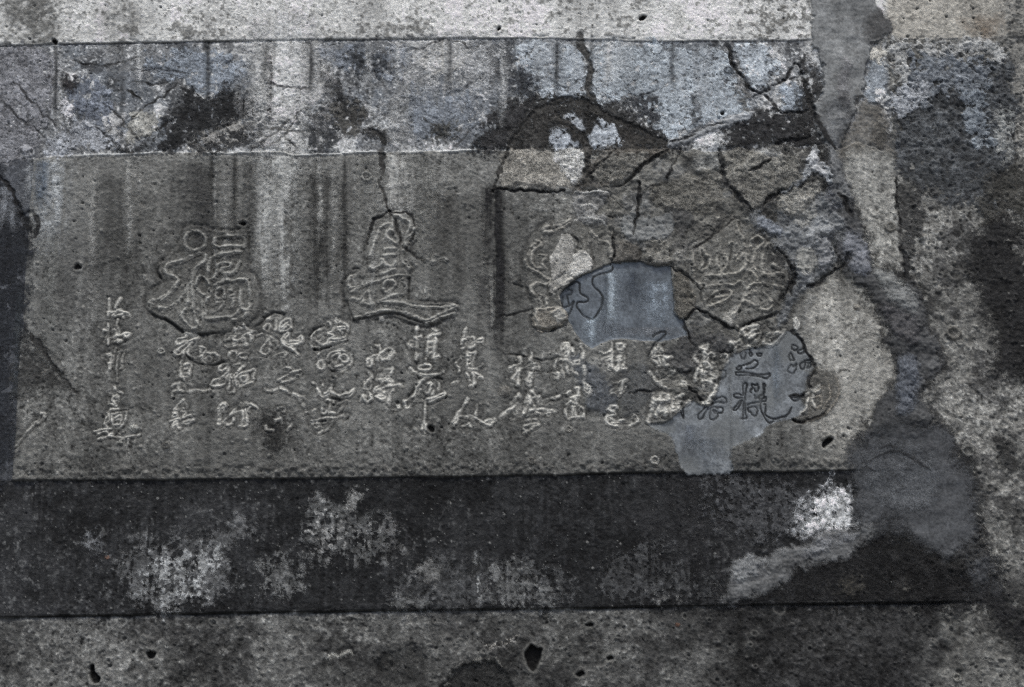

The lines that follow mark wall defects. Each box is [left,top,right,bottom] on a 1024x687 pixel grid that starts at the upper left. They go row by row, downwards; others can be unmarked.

crack [261,82,307,148]
leakage [88,8,691,310]
crack [357,102,426,264]
leakage [480,187,506,344]
crack [493,31,854,424]
leakage [709,52,1024,662]